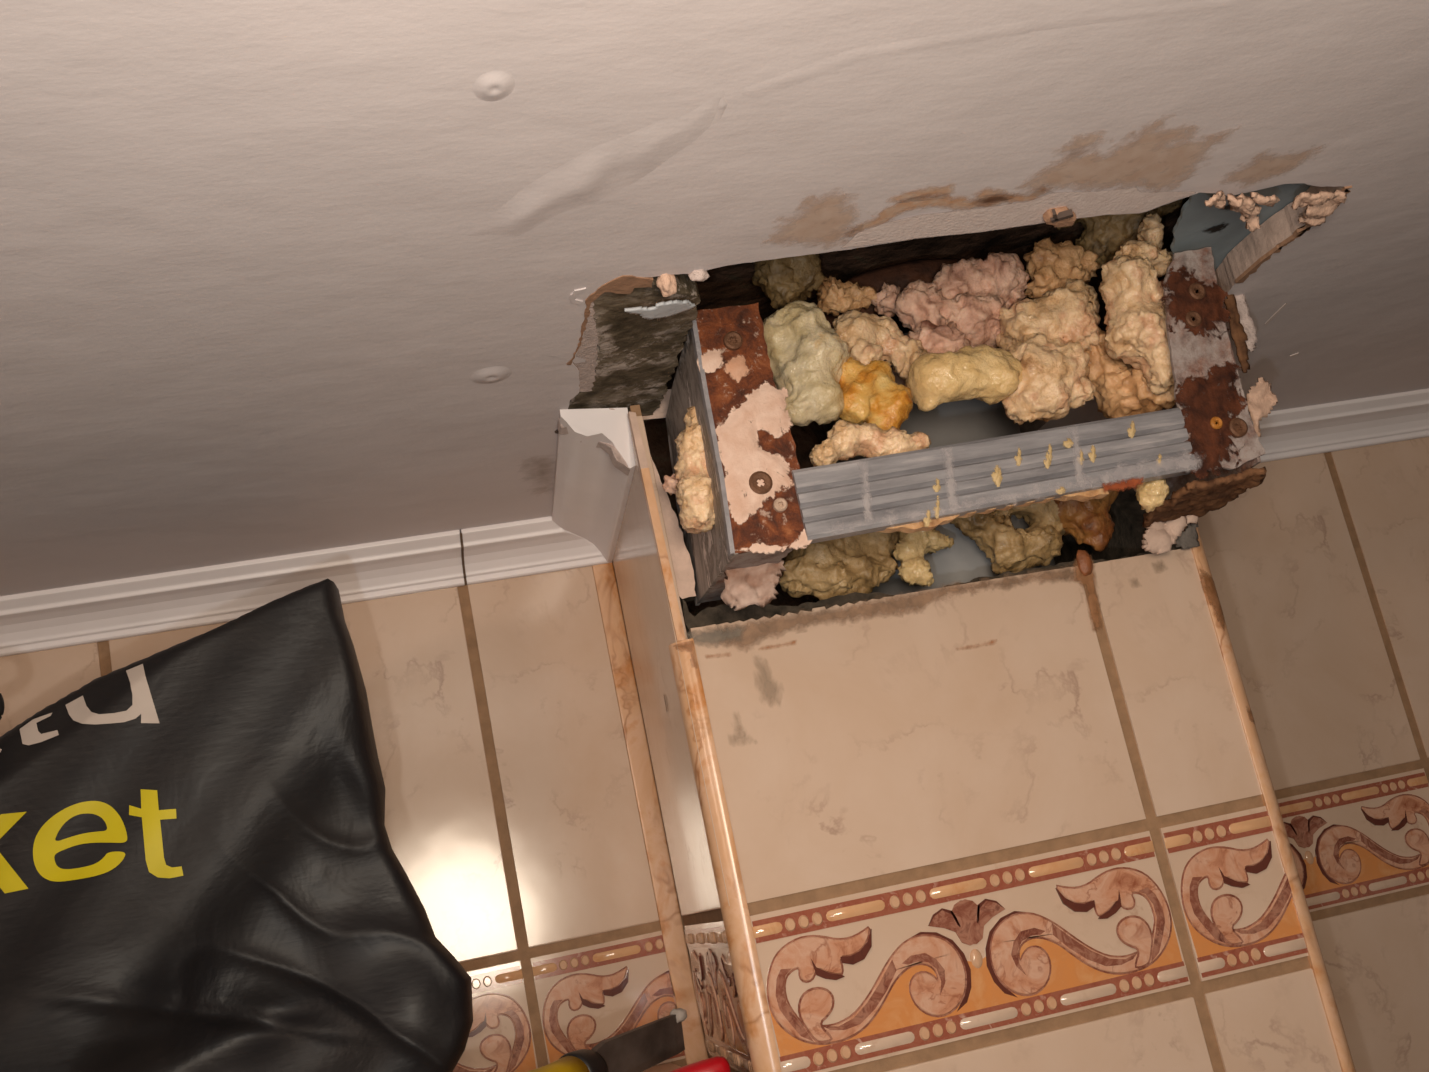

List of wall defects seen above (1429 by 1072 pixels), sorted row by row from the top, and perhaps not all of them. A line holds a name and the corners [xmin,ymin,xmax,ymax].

leakage [767,121,1225,244]
leakage [1229,150,1311,183]
peeling [841,186,1352,284]
corrosion [1159,265,1231,339]
peeling [557,274,701,434]
flaking render [596,442,630,476]
corrosion [1175,361,1247,479]